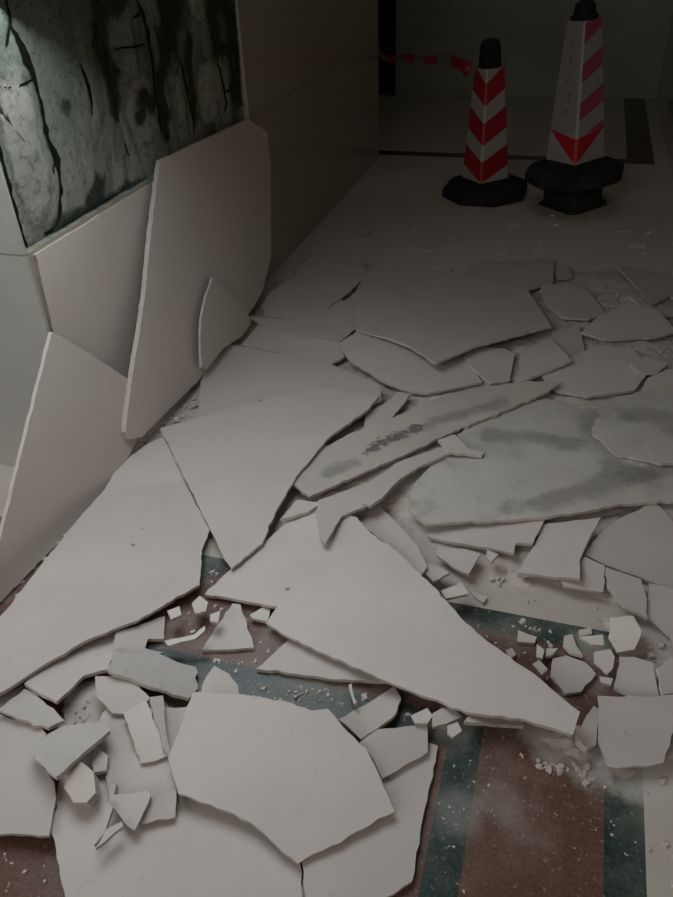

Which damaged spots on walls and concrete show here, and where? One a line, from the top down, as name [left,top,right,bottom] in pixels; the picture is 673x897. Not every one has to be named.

crack [0,0,63,247]
leakage [51,0,145,234]
crack [80,0,161,126]
spalling [0,0,244,248]
leakage [135,0,197,142]
leakage [208,0,244,107]
crack [214,44,241,112]
spalling [464,346,515,386]
spalling [280,485,498,605]
spalling [517,517,673,770]
spalling [0,596,270,847]
spalling [339,684,524,779]